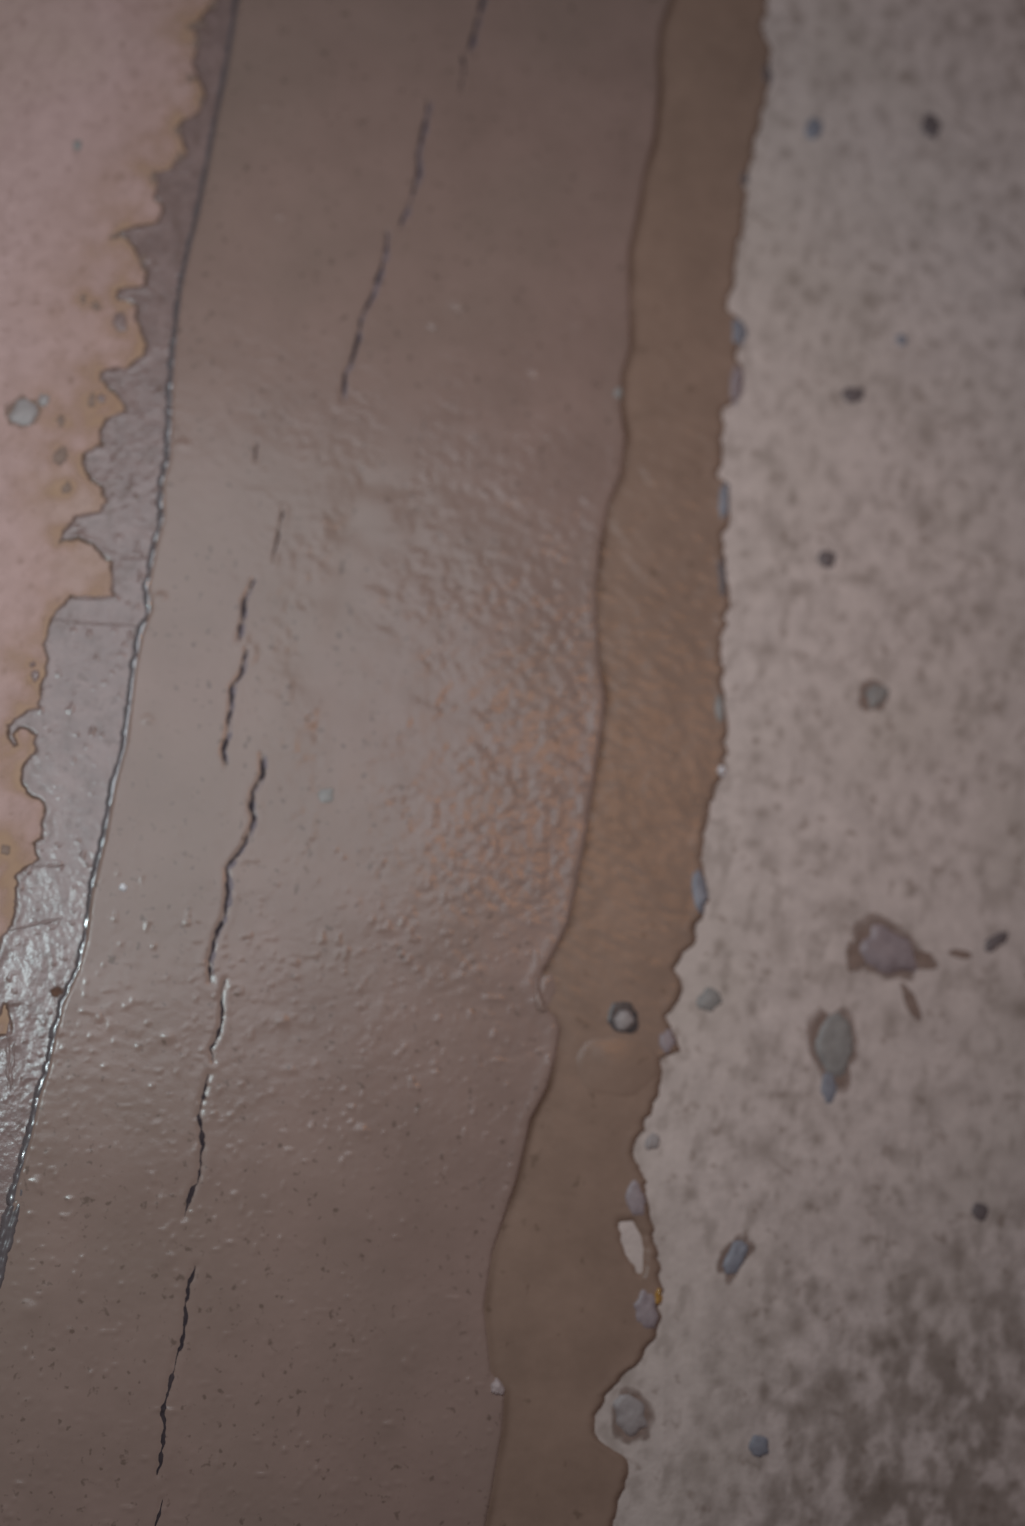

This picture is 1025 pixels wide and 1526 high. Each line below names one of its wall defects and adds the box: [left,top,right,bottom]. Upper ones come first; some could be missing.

crack [467,0,487,53]
crack [341,100,432,401]
peeling [730,364,744,407]
peeling [717,556,726,597]
peeling [0,0,233,1223]
crack [184,511,284,1217]
peeling [691,869,708,914]
flaking render [696,987,722,1012]
peeling [619,1180,659,1329]
flaking render [718,1237,754,1282]
crack [154,1266,196,1526]
spalling [612,1390,652,1443]